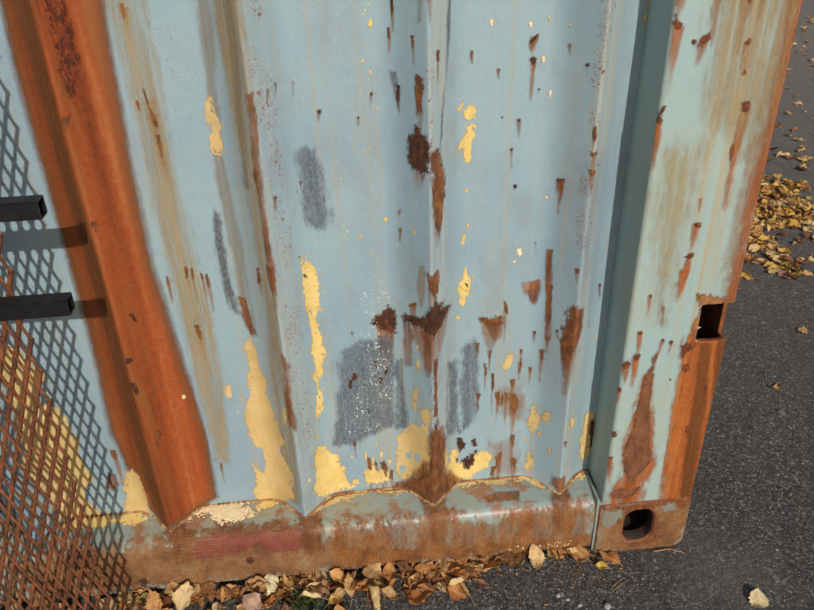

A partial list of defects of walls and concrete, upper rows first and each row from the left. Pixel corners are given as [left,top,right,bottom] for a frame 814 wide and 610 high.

peeling [204,96,227,159]
peeling [455,99,477,163]
peeling [2,344,156,531]
peeling [188,336,295,526]
rust [0,0,595,600]
peeling [298,255,433,516]
peeling [457,267,474,306]
peeling [443,437,551,491]
peeling [522,403,551,442]
rust [597,0,802,552]